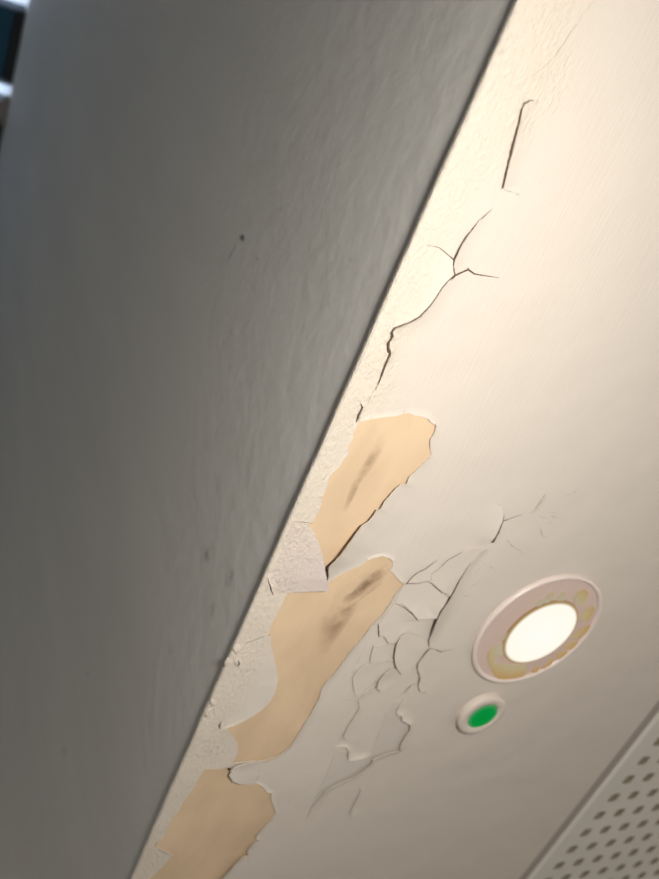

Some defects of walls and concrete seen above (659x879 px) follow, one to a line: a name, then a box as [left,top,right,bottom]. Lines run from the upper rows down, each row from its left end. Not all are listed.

crack [356,210,498,422]
peeling [147,405,491,879]